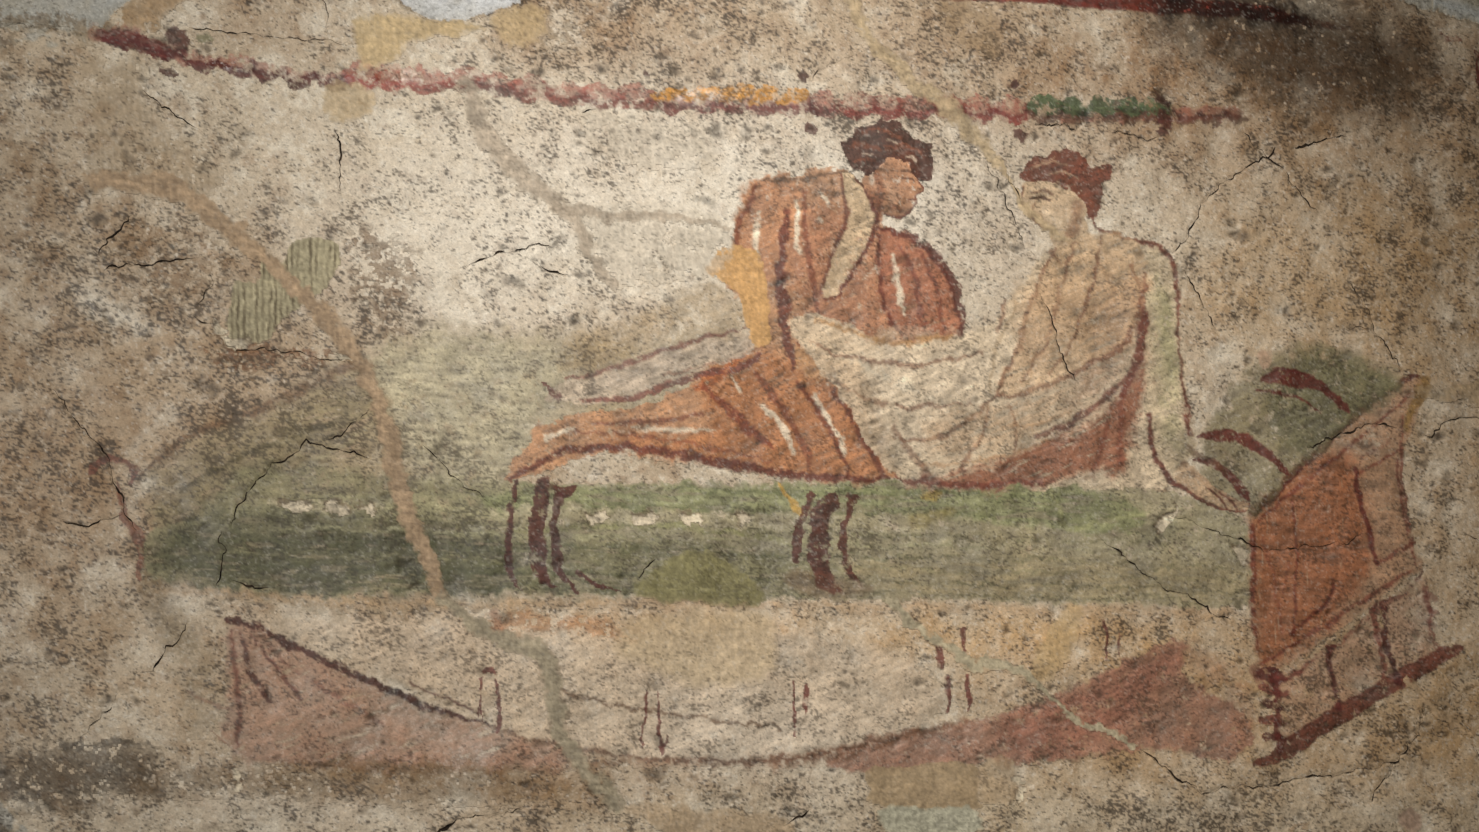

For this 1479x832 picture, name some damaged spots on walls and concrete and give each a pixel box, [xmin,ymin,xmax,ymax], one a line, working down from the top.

water stain [1111,0,1468,144]
crack [1172,133,1346,330]
crack [1306,283,1479,448]
crack [81,166,627,816]
crack [1104,542,1229,618]